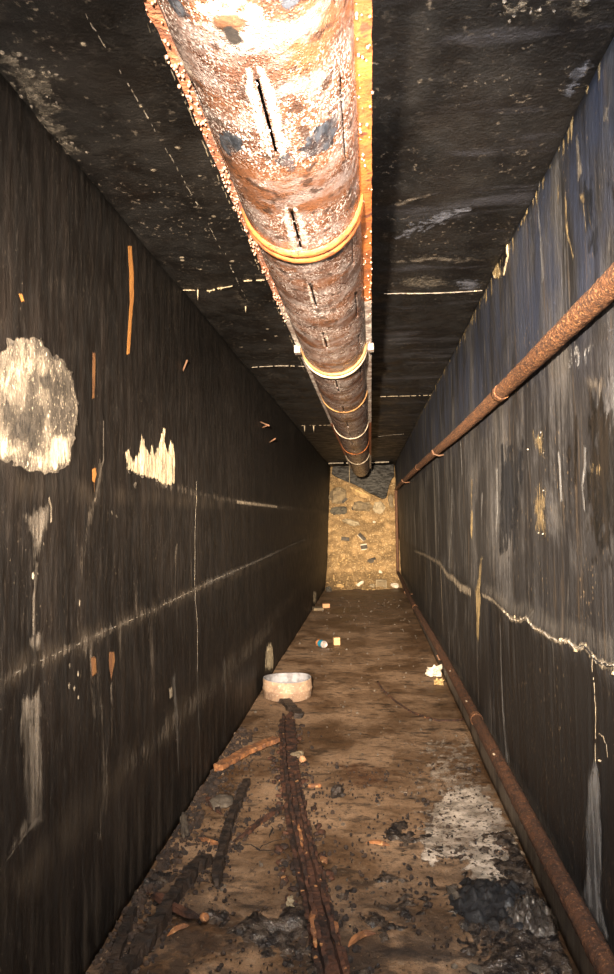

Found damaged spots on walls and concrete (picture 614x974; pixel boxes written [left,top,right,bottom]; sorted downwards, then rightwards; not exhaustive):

peeling [0,337,79,475]
spalling [126,429,175,488]
crack [592,659,608,762]
damp [584,764,607,939]